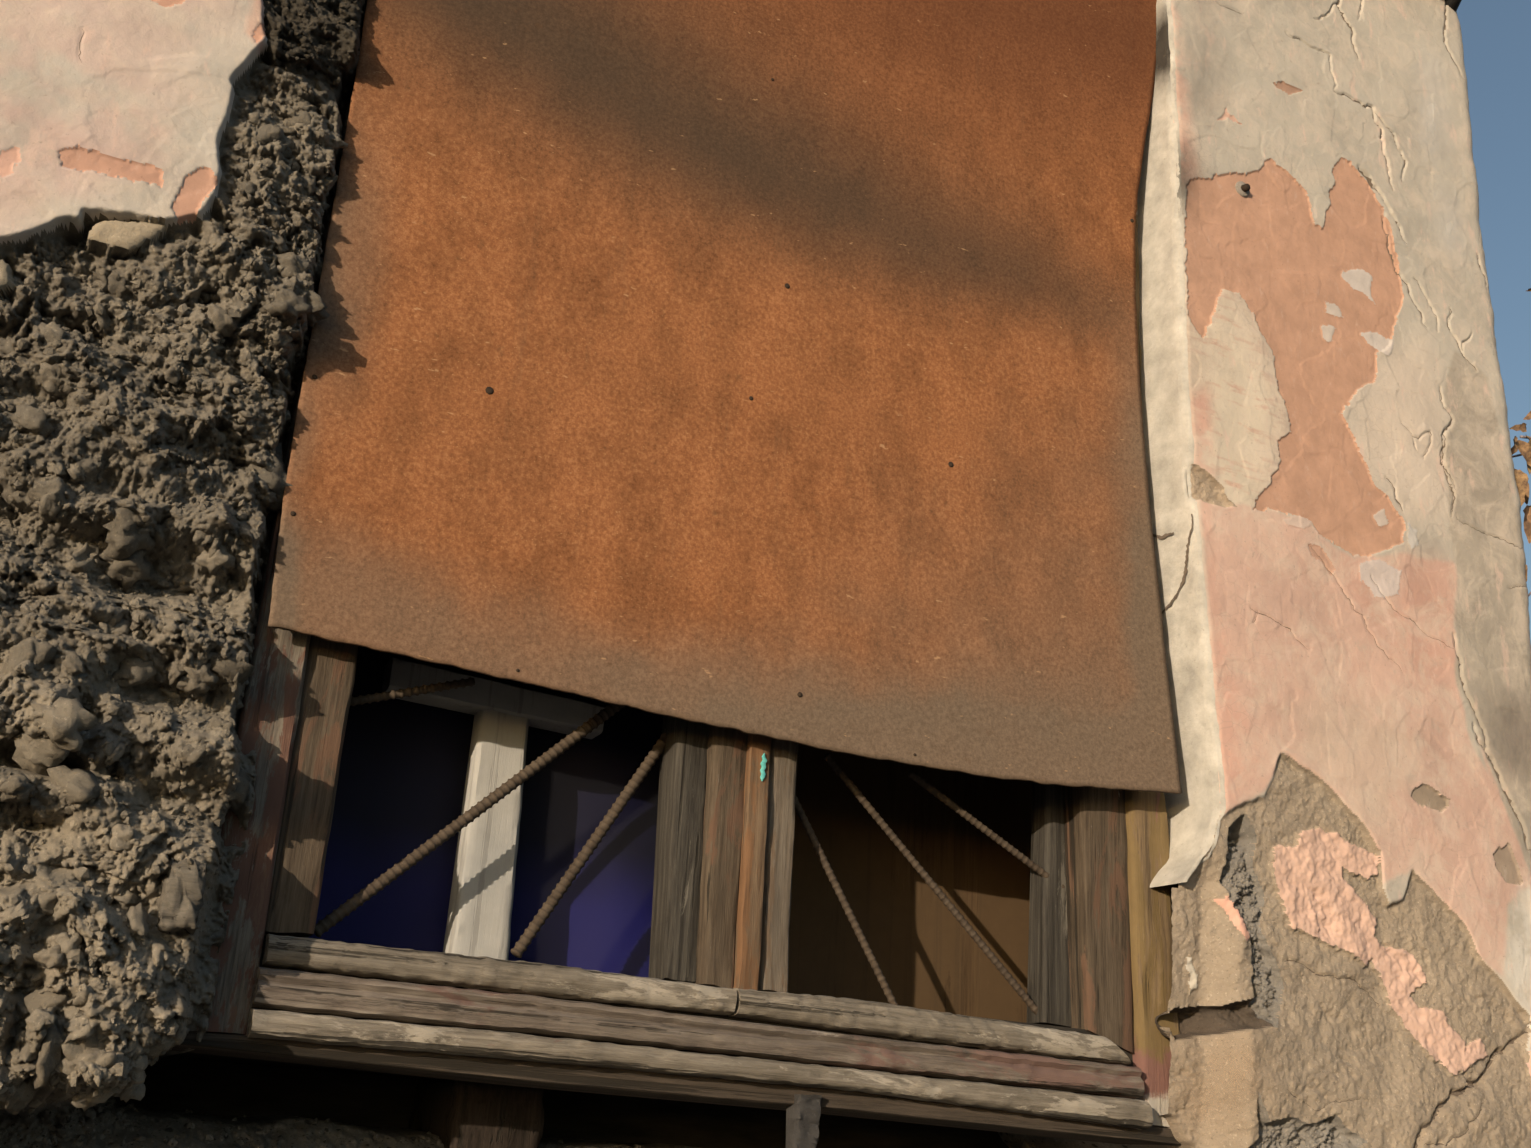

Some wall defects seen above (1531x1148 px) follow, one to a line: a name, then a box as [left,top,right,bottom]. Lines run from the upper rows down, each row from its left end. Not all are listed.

crack [1287,0,1476,369]
spalling [0,0,367,1114]
peeling [1184,157,1419,598]
crack [1317,555,1531,851]
crack [1402,390,1518,547]
crack [1284,960,1380,1007]
spalling [1140,753,1531,1148]
crack [1414,1024,1531,1148]